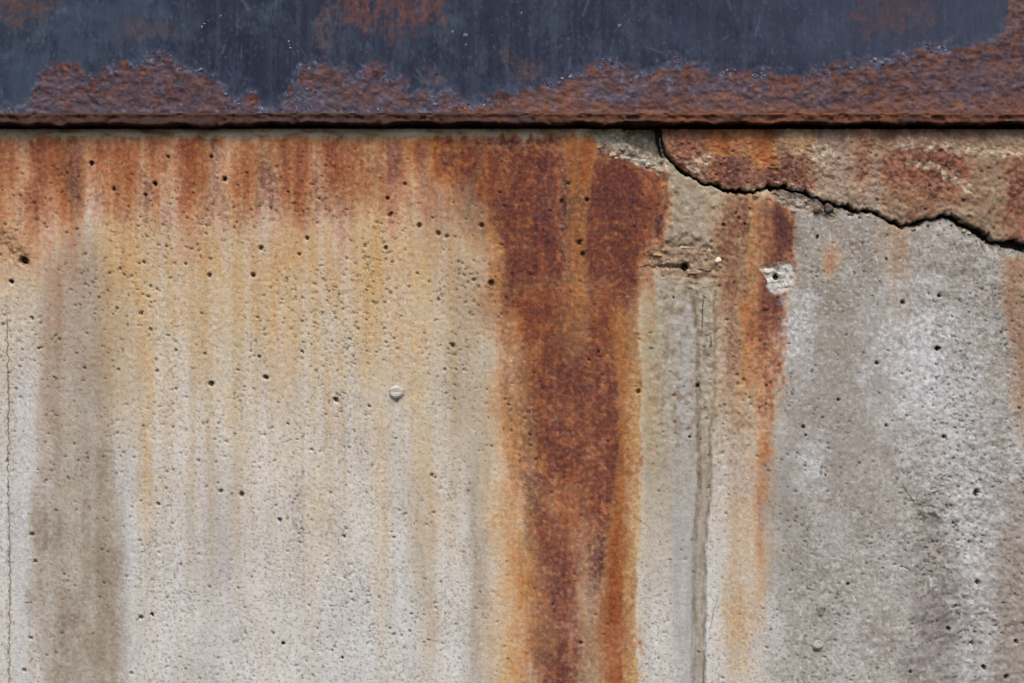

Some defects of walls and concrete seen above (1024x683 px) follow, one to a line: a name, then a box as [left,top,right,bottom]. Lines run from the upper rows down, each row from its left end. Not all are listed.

rust [0,0,1024,113]
crack [654,127,1024,251]
spalling [759,260,798,298]
rust [0,129,819,683]